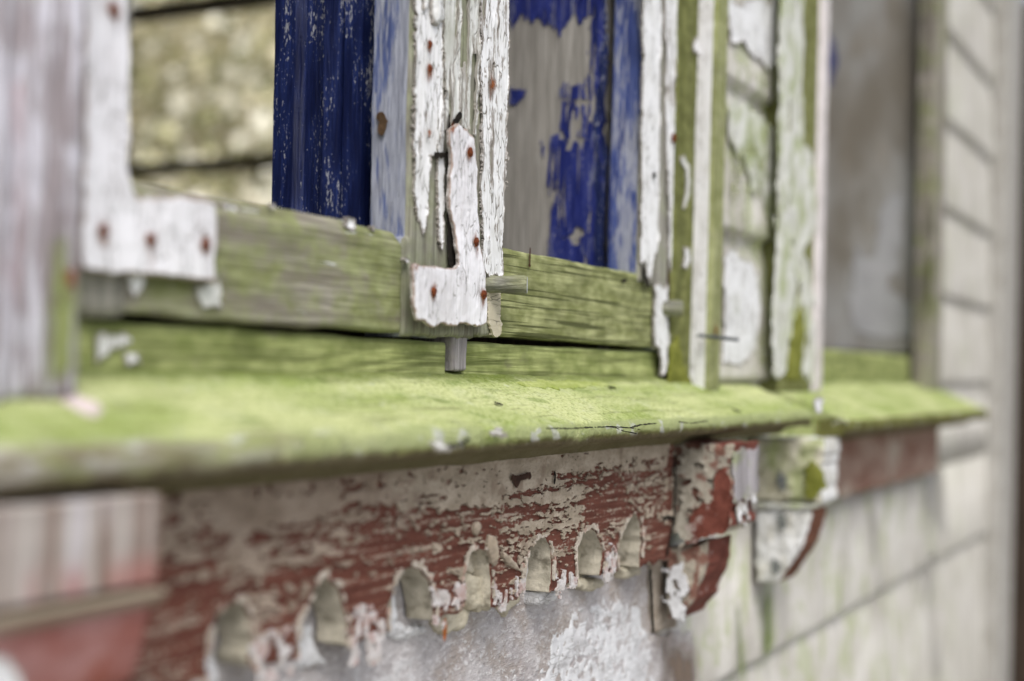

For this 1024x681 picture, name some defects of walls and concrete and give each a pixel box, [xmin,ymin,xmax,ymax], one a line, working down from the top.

peeling [411,0,609,277]
peeling [638,0,691,376]
peeling [721,0,817,384]
peeling [427,440,459,452]
spalling [136,444,760,681]
crack [546,420,708,434]
spalling [771,559,782,576]
spalling [776,511,788,530]